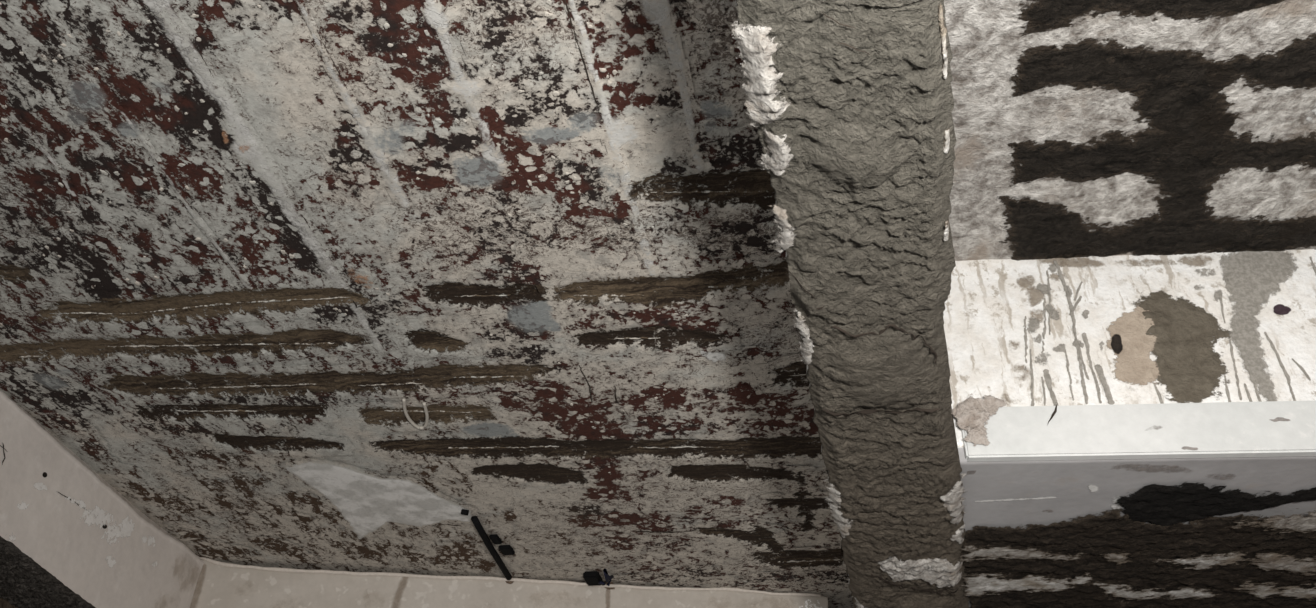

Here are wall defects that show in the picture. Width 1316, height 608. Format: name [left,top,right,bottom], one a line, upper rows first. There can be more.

peeling [0,0,320,292]
peeling [179,0,784,279]
peeling [0,307,43,339]
peeling [480,317,818,440]
peeling [564,306,801,365]
flaking render [0,368,522,574]
peeling [552,461,838,587]